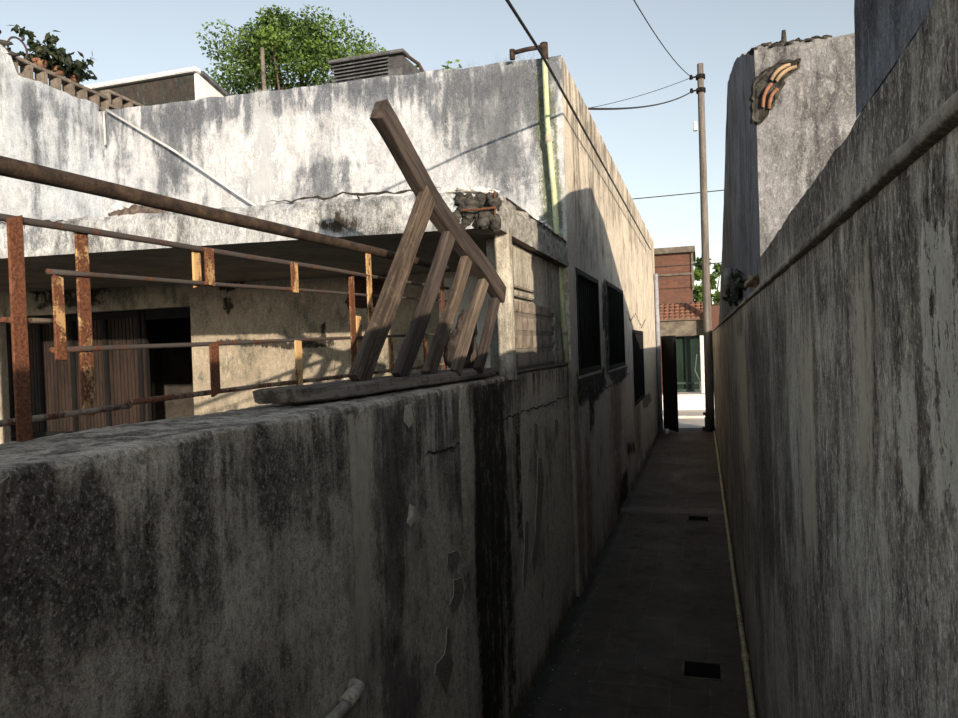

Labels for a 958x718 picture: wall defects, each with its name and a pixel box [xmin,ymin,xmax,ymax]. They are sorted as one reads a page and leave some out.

water stain [249,91,277,200]
water stain [316,211,360,233]
crack [268,189,412,203]
water stain [441,62,538,194]
water stain [549,92,563,237]
water stain [737,323,751,469]
water stain [798,304,818,580]
water stain [850,239,873,490]
water stain [893,209,958,527]
water stain [474,381,524,718]